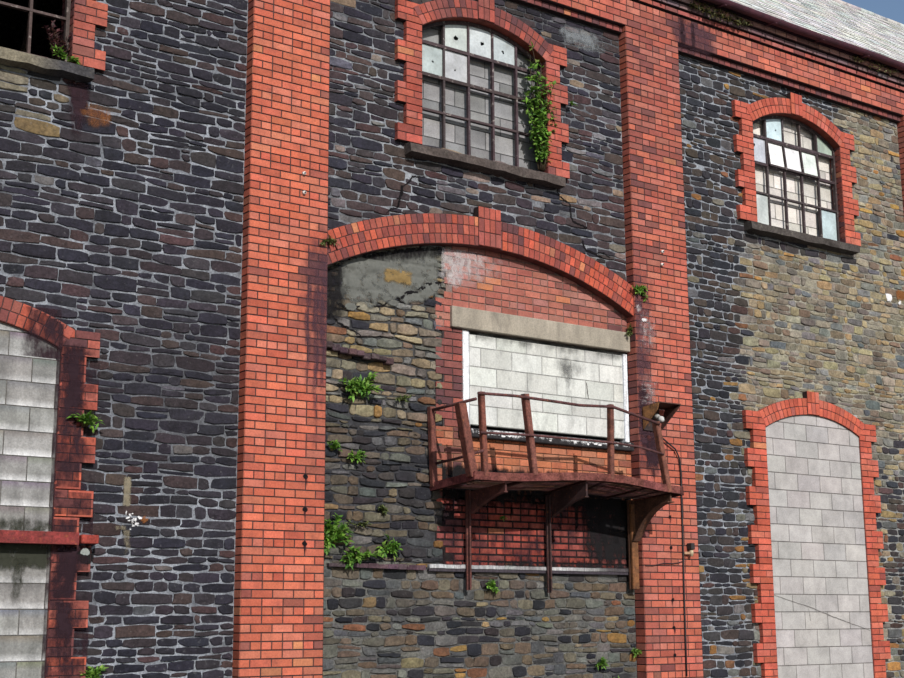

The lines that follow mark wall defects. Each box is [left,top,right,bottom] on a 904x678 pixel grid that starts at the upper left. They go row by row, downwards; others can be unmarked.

water stain [306,252,328,378]
flaking render [327,246,442,320]
water stain [0,520,52,531]
water stain [0,543,79,642]